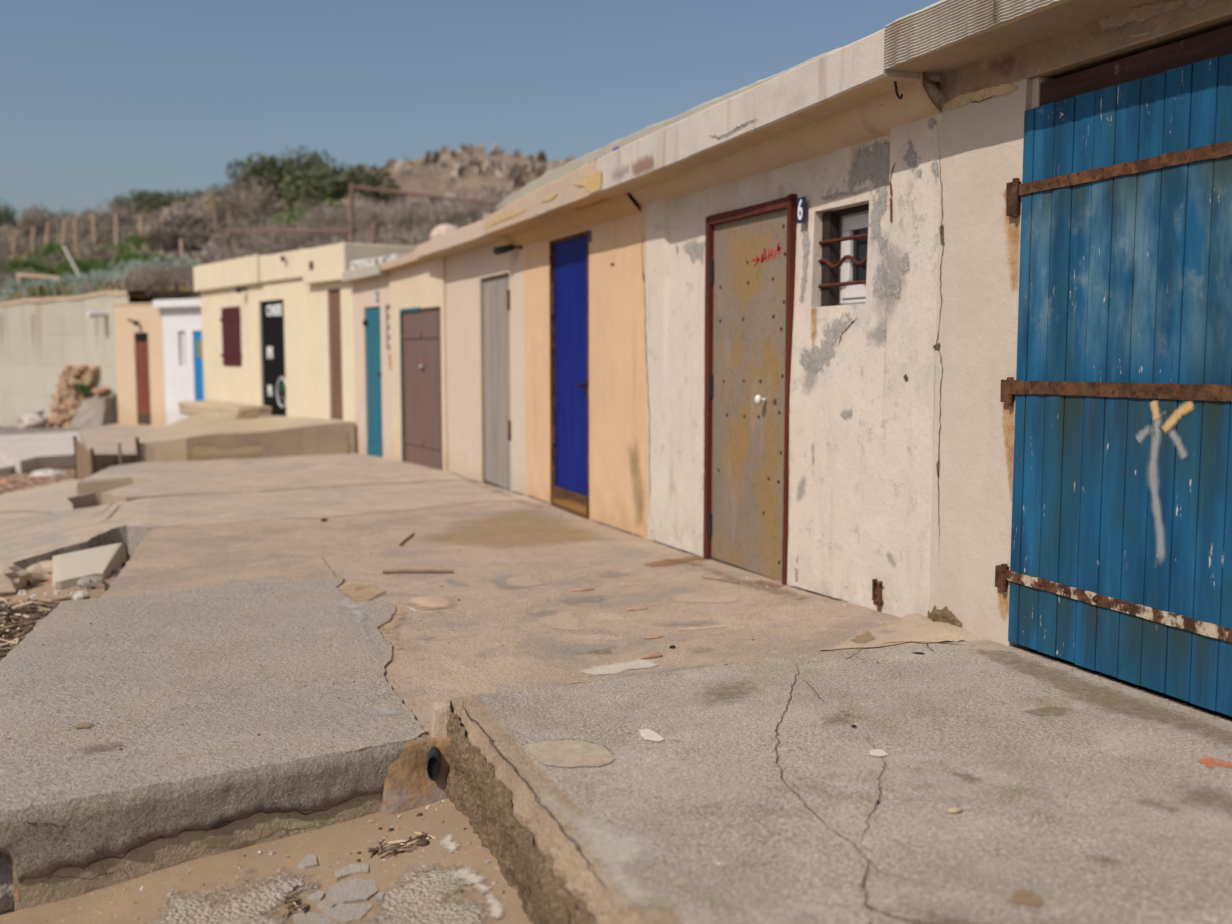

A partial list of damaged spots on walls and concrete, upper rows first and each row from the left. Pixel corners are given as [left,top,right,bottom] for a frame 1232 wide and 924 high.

peeling [928,83,1016,109]
peeling [676,236,705,263]
peeling [800,229,810,303]
peeling [822,140,939,299]
peeling [800,313,855,387]
crack [933,141,944,560]
rust [1004,405,1014,482]
crack [775,663,966,924]
spalling [0,851,20,914]
peeling [294,863,384,924]